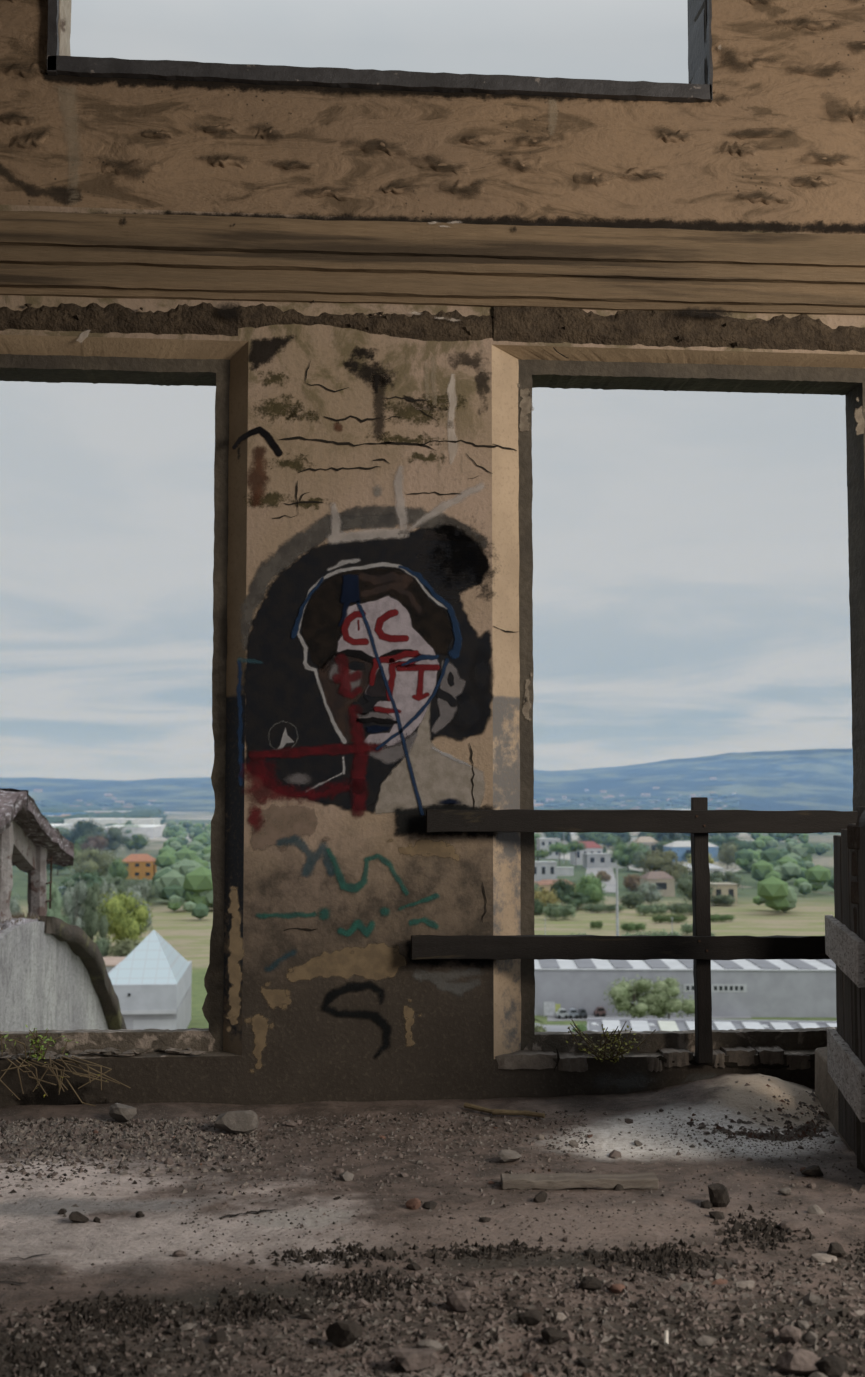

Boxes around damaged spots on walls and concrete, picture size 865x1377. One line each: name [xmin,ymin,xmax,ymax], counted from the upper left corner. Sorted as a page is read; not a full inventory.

spalling [0,300,865,352]
crack [272,361,517,519]
peeling [226,886,407,1073]
peeling [403,1000,421,1047]